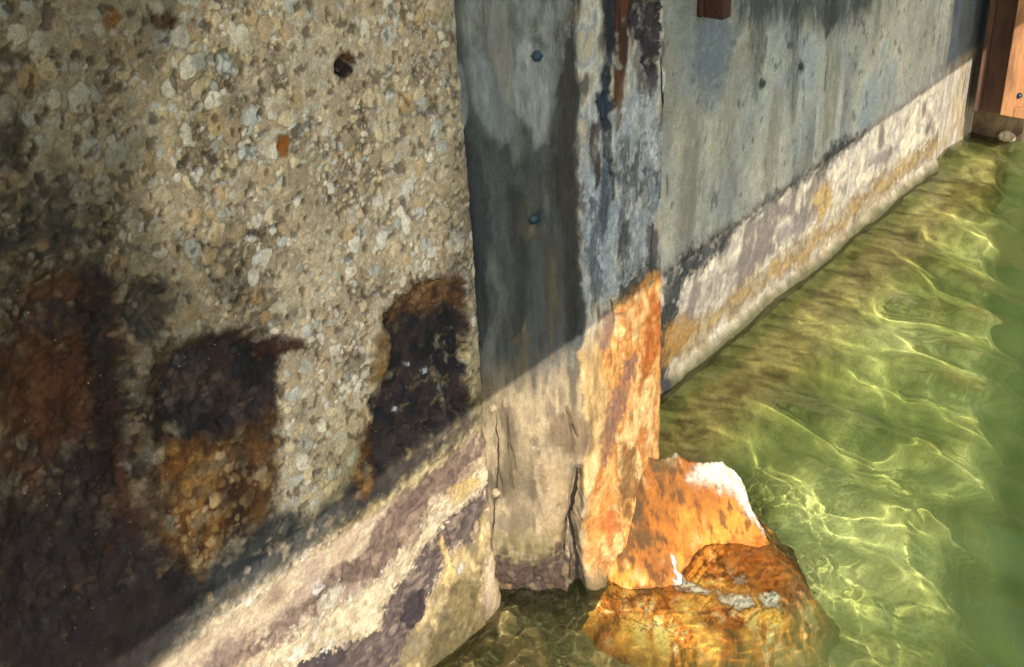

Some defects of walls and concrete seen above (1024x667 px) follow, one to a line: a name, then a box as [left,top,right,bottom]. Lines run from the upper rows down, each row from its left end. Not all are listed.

rust [612,0,632,108]
water stain [458,0,873,393]
rust [0,260,306,667]
crack [490,411,512,541]
crack [563,445,580,579]
rust [583,269,661,577]